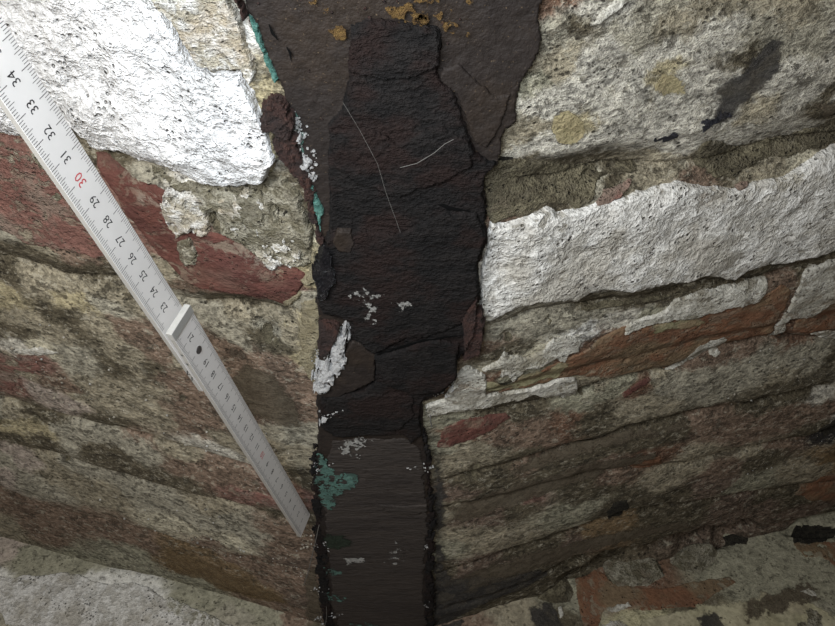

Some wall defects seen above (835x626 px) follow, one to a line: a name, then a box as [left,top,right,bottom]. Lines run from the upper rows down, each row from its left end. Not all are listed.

peeling [332,63,511,198]
spalling [692,125,835,191]
leakage [311,320,351,394]
leakage [348,288,381,325]
peeling [317,156,637,431]
flaking render [498,285,791,398]
flaking render [792,303,835,333]
flaking render [437,413,511,448]